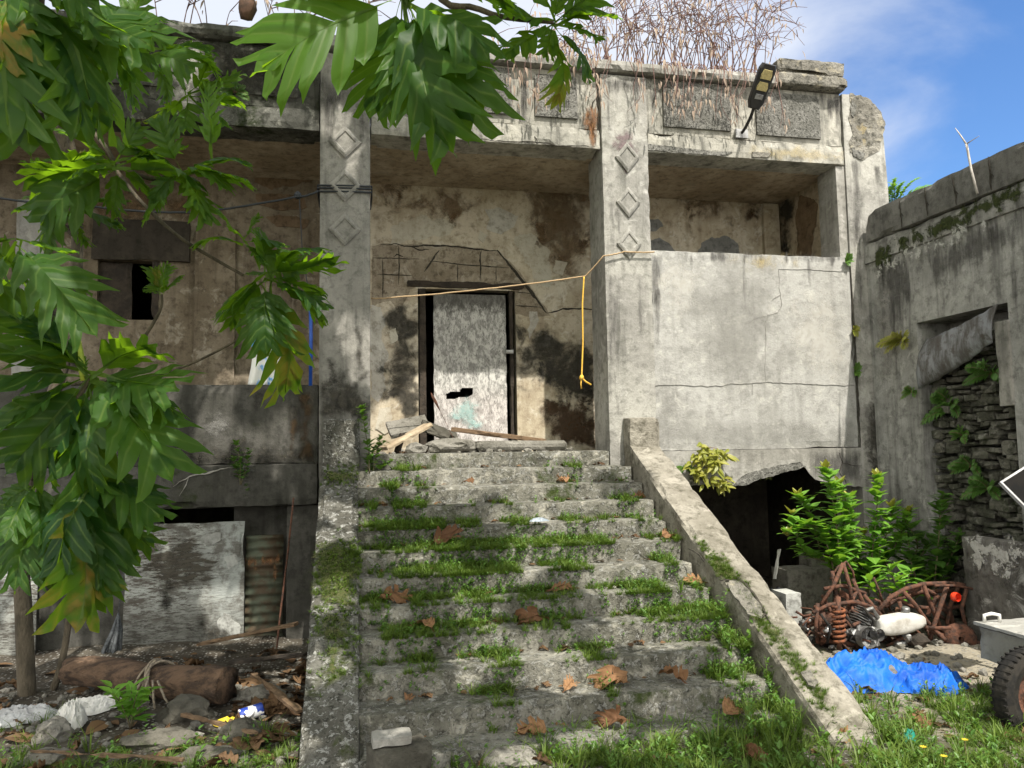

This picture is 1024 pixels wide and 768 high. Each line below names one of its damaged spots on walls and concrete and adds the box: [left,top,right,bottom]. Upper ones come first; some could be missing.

spalling [848,93,886,160]
crack [382,243,592,313]
water stain [529,192,590,275]
water stain [933,212,1013,277]
water stain [321,305,420,419]
water stain [514,325,596,448]
crack [687,266,861,482]
spalling [687,462,805,486]
water stain [139,537,218,609]
water stain [190,623,230,640]